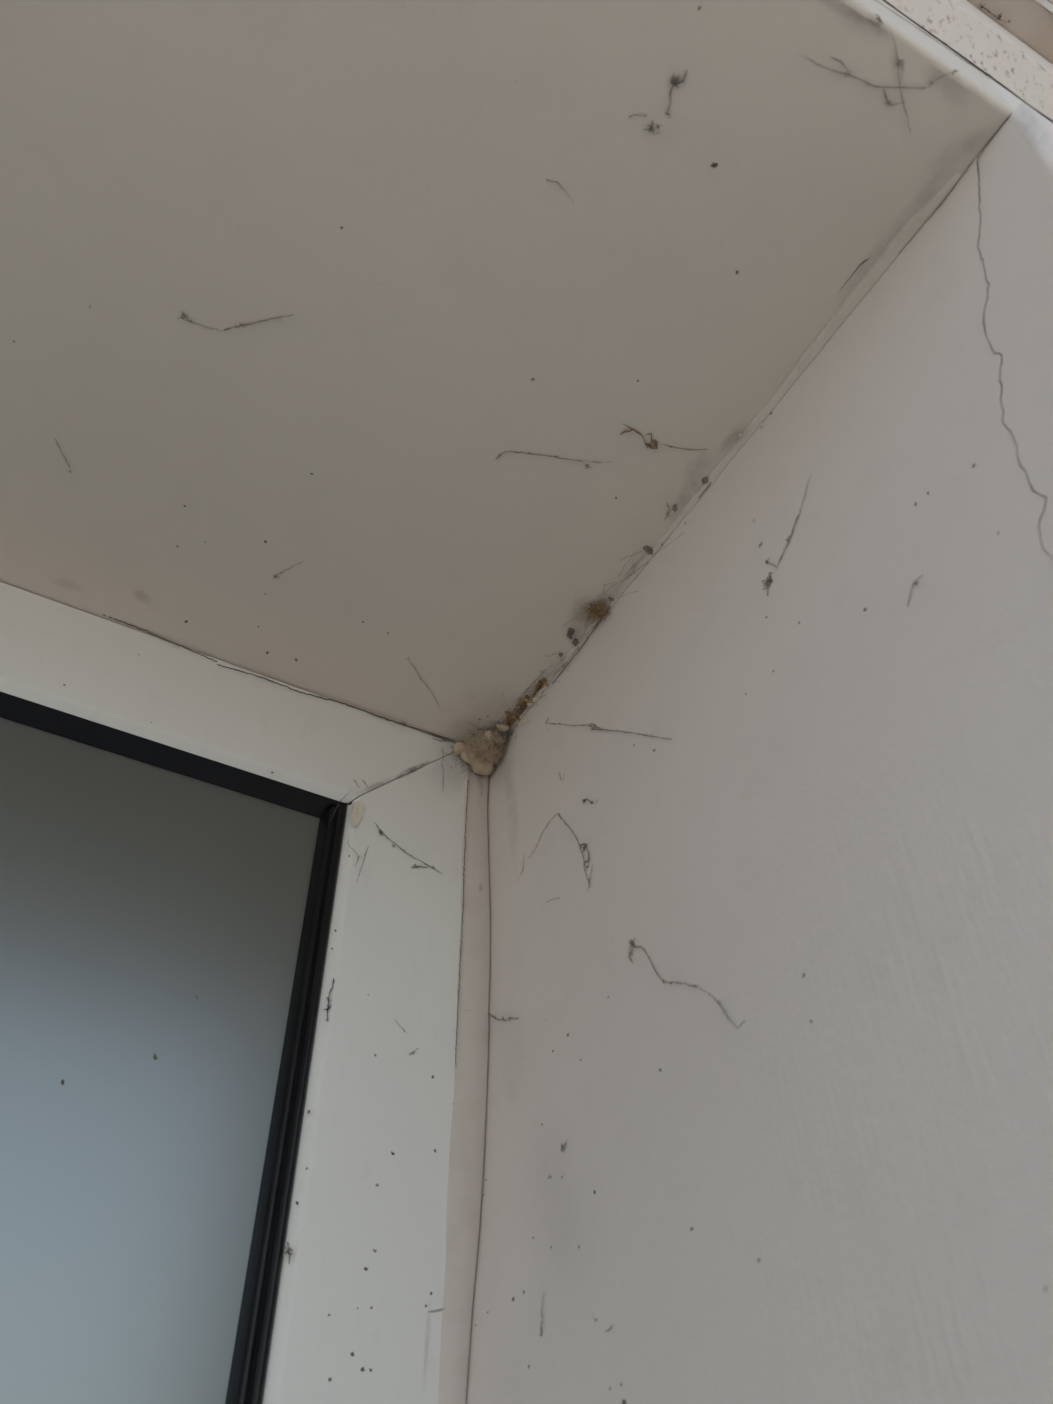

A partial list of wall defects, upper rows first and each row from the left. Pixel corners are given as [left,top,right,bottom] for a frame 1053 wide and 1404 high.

crack [841,0,1053,558]